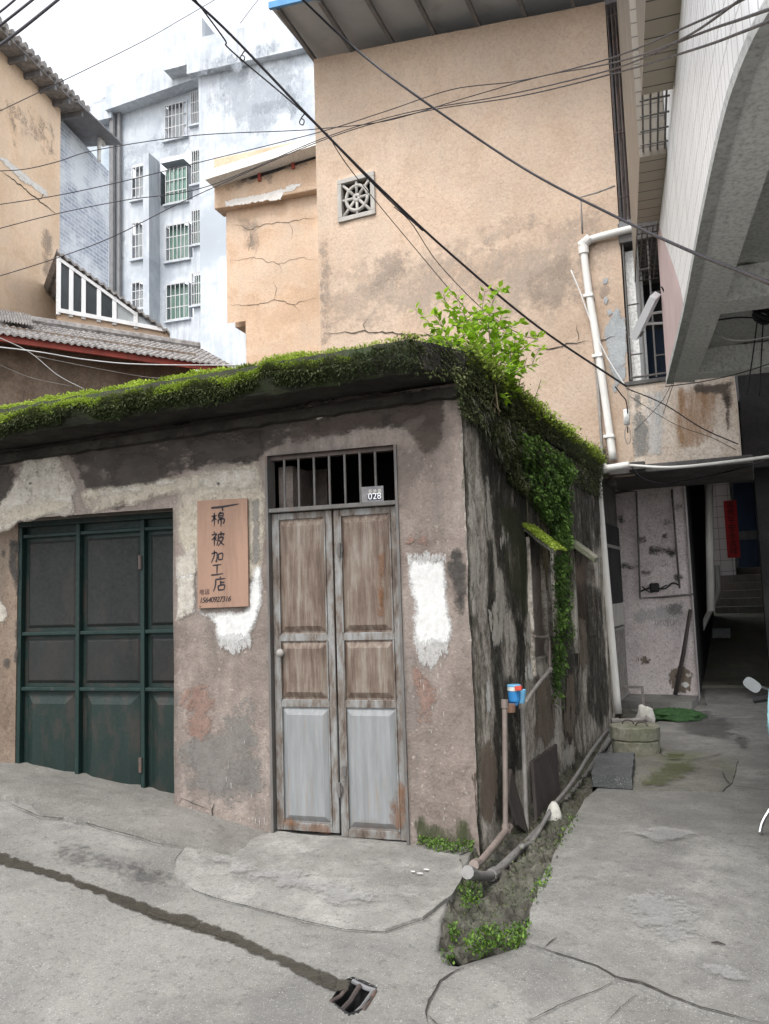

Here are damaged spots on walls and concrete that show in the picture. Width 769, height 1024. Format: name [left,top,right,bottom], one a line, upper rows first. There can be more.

crack [233,217,318,311]
crack [324,320,455,338]
spalling [600,278,627,392]
leakage [632,393,663,457]
leakage [694,382,732,430]
peeling [0,456,265,579]
leakage [478,411,616,821]
crack [425,966,465,1024]
crack [529,938,767,1024]